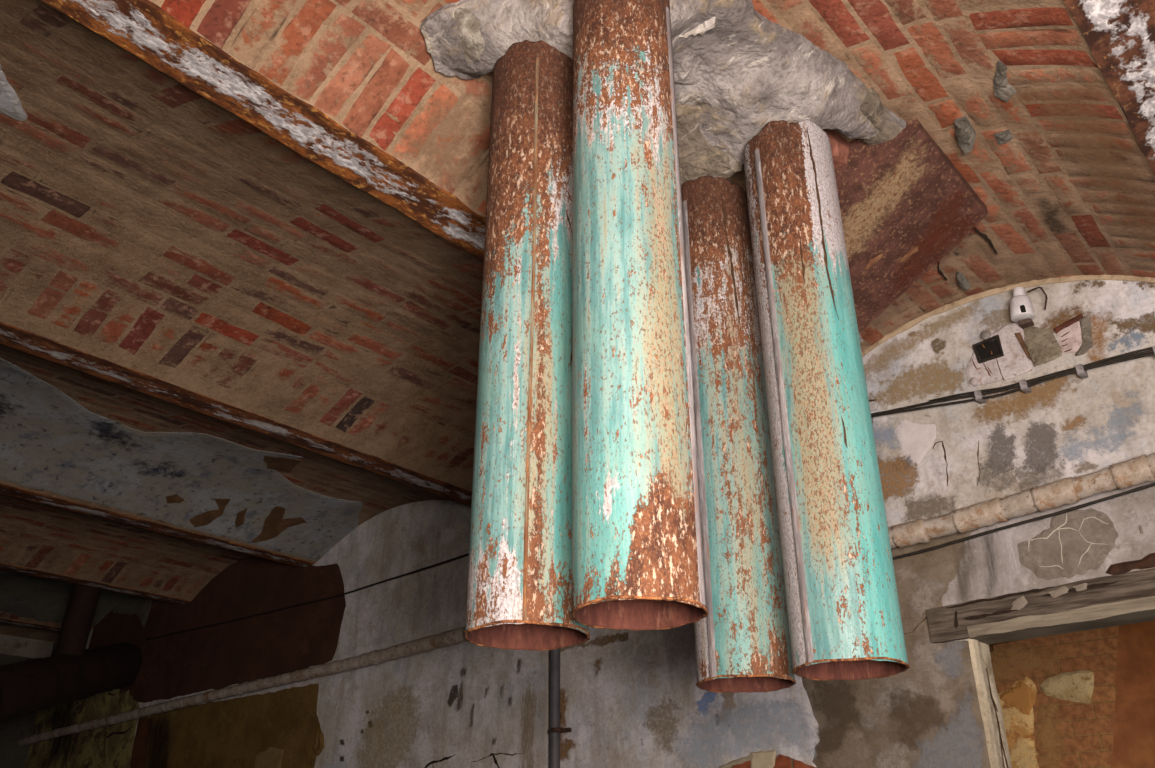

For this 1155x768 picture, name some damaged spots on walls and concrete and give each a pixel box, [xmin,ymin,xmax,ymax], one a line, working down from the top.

peeling [0,70,24,115]
peeling [263,456,302,472]
peeling [189,499,247,528]
peeling [252,506,307,543]
crack [1017,508,1118,580]
peeling [718,481,1155,768]
crack [986,668,1009,768]
crack [425,753,522,768]